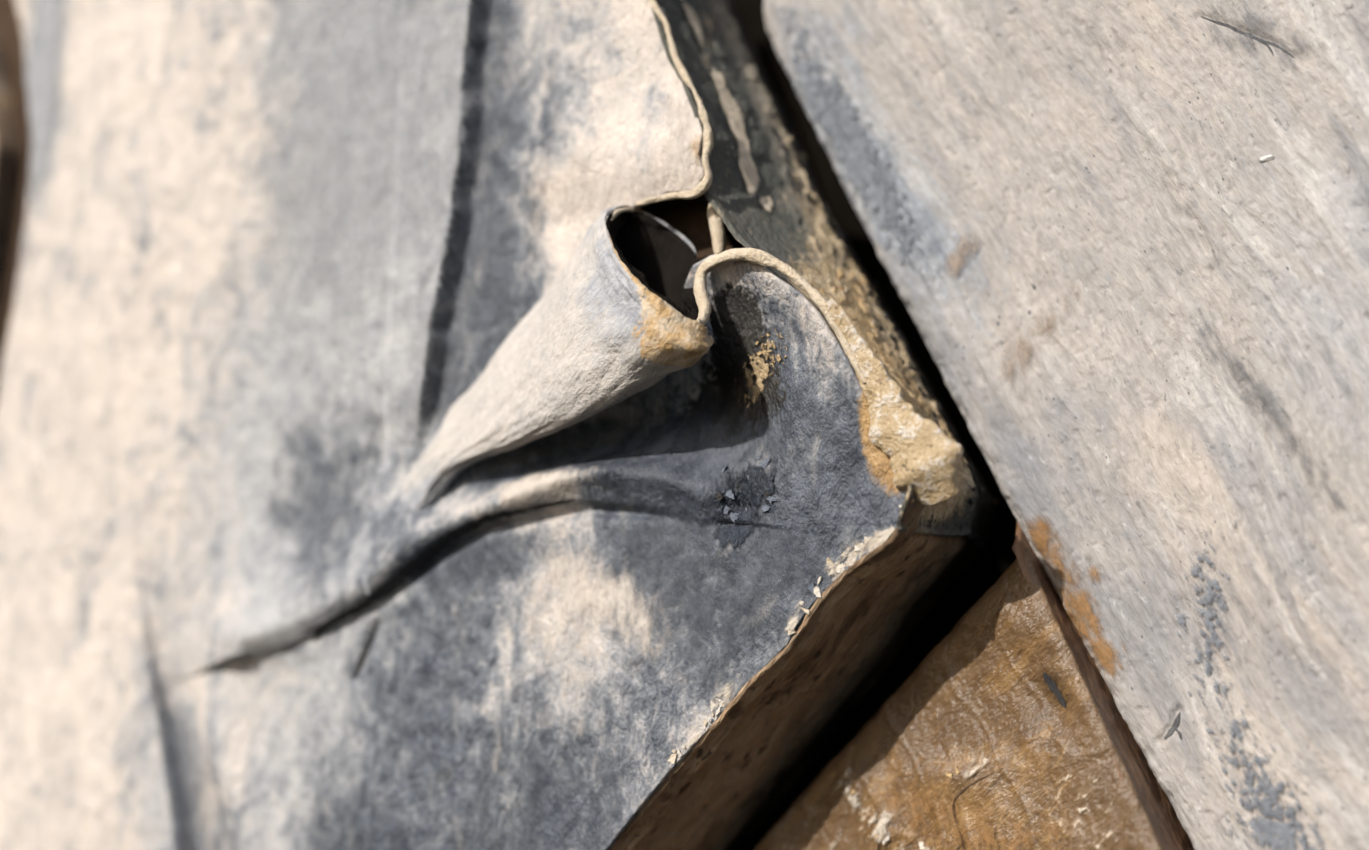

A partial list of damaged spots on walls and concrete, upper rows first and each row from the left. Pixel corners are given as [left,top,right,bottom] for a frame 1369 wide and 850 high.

peeling [682,1,704,45]
peeling [712,67,773,212]
peeling [735,328,791,408]
peeling [810,254,976,505]
peeling [501,471,577,504]
spalling [712,452,780,549]
peeling [550,555,649,650]
peeling [785,504,914,635]
corrosion [1028,517,1122,676]
peeling [668,683,731,768]
crack [952,771,994,850]